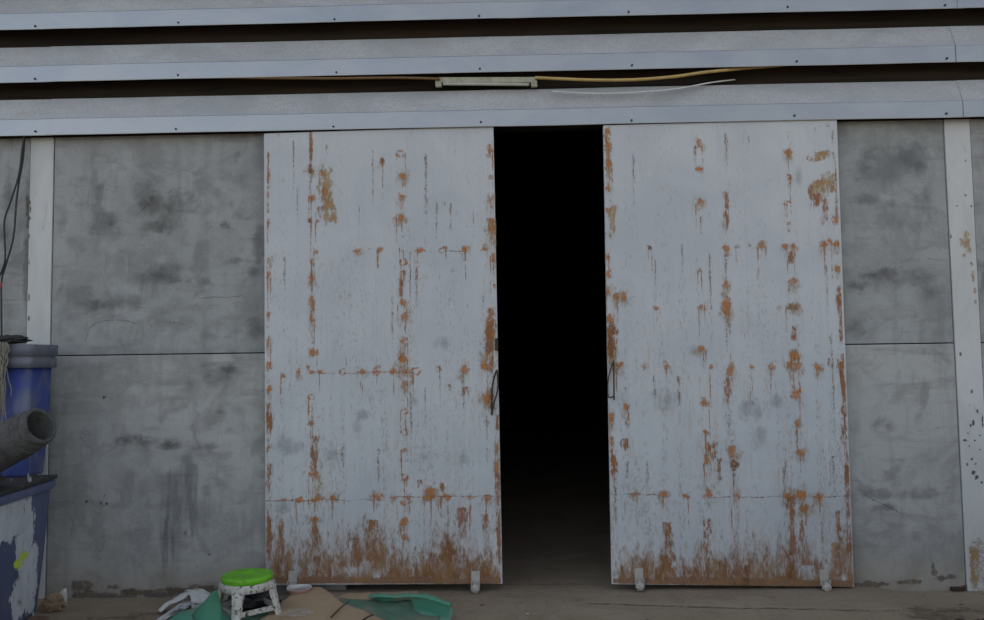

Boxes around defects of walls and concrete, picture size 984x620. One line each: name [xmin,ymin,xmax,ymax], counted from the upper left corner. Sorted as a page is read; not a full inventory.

rust [293,131,337,331]
rust [603,129,613,191]
rust [605,205,616,237]
rust [808,151,839,224]
rust [605,253,626,390]
rust [266,247,501,584]
rust [609,403,629,522]
rust [613,239,853,587]
rust [969,548,978,587]